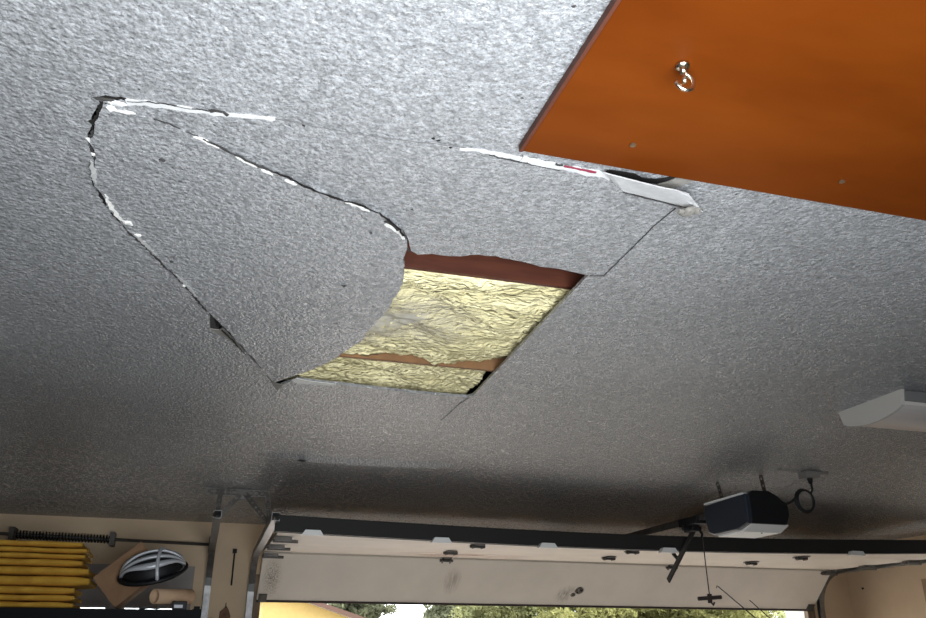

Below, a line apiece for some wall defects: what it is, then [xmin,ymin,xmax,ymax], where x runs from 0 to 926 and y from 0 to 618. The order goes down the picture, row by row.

crack [276,118,466,149]
crack [86,96,411,363]
crack [596,208,676,276]